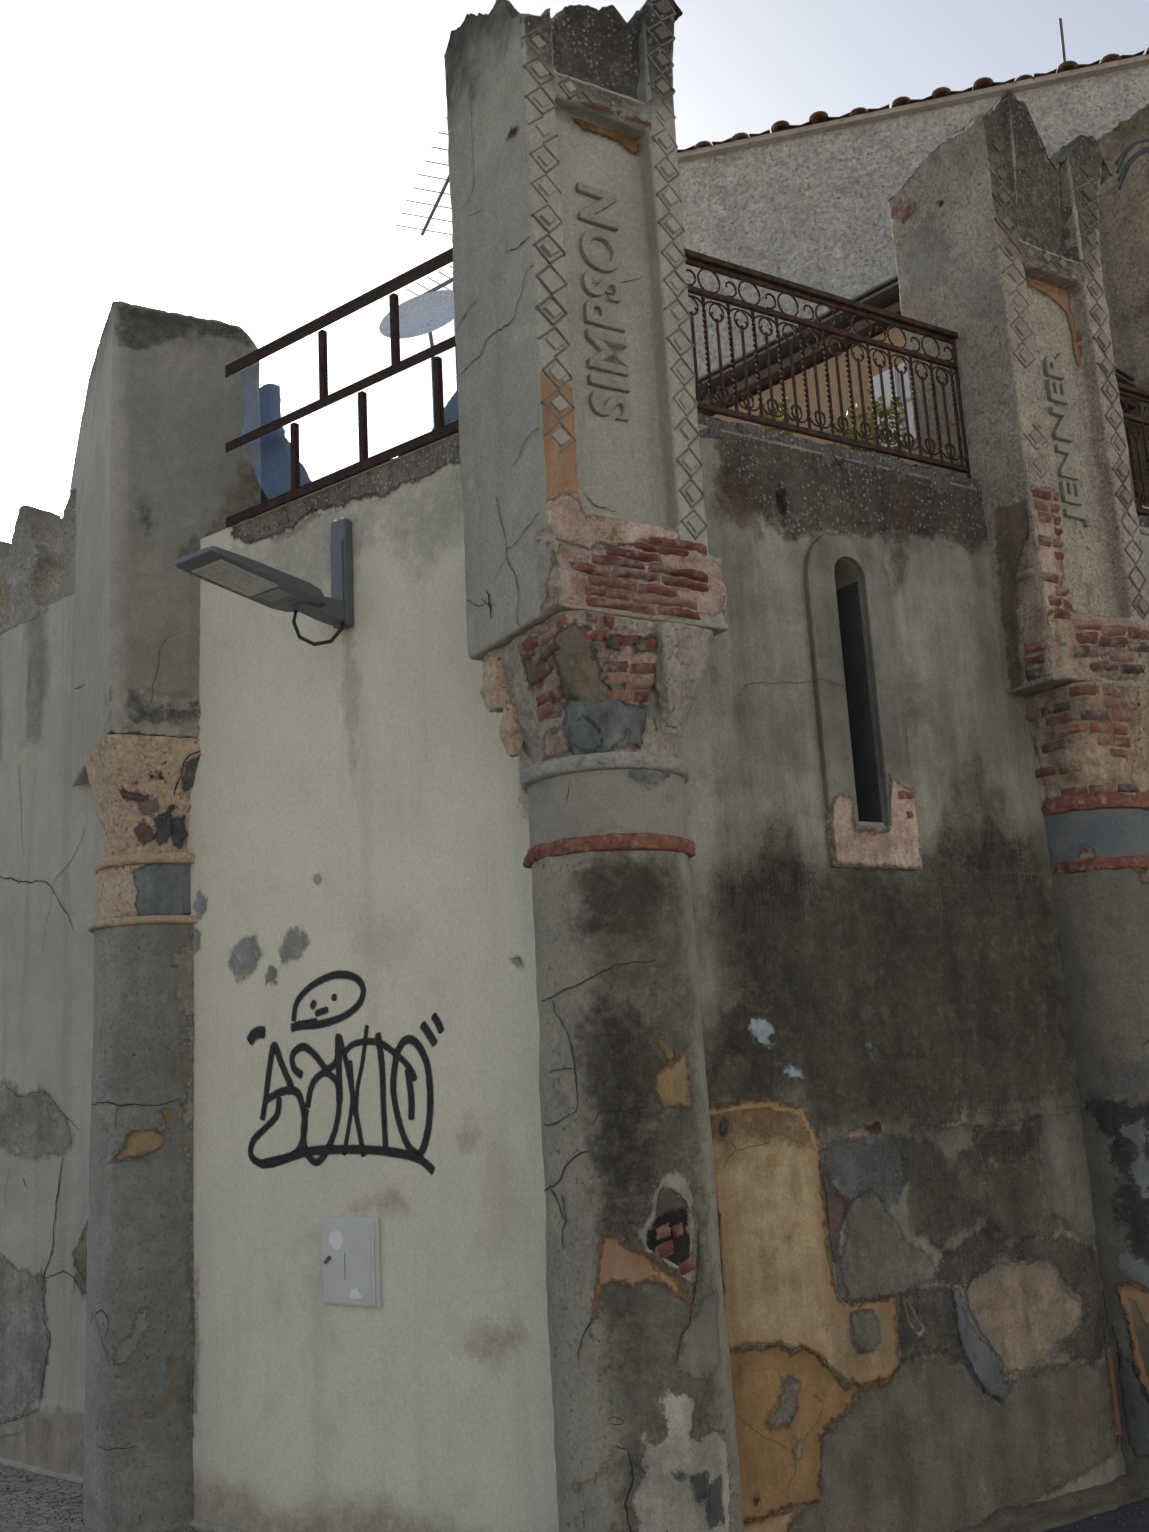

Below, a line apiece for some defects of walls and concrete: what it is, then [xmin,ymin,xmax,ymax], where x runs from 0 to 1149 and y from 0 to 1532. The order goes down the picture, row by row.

flaking render [517,373,726,787]
flaking render [995,485,1149,800]
crack [0,765,85,948]
flaking render [0,1168,88,1424]
flaking render [107,750,201,1201]
crack [541,960,656,1249]
flaking render [578,1031,1149,1532]
damp [583,827,1149,1532]